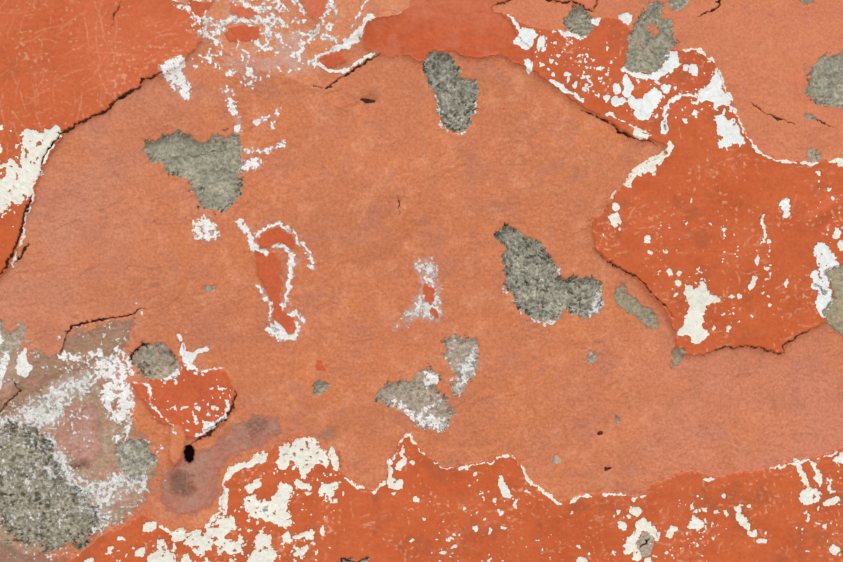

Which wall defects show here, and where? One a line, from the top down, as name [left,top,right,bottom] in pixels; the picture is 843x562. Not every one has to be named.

crack [546,0,597,12]
crack [313,56,376,89]
crack [40,72,161,173]
crack [587,112,651,142]
peeling [713,108,745,151]
crack [0,199,32,274]
crack [62,309,138,350]
peeling [234,478,316,562]
peeling [317,478,341,503]
peeling [463,475,518,534]
peeling [618,506,660,562]
peeling [678,500,767,547]